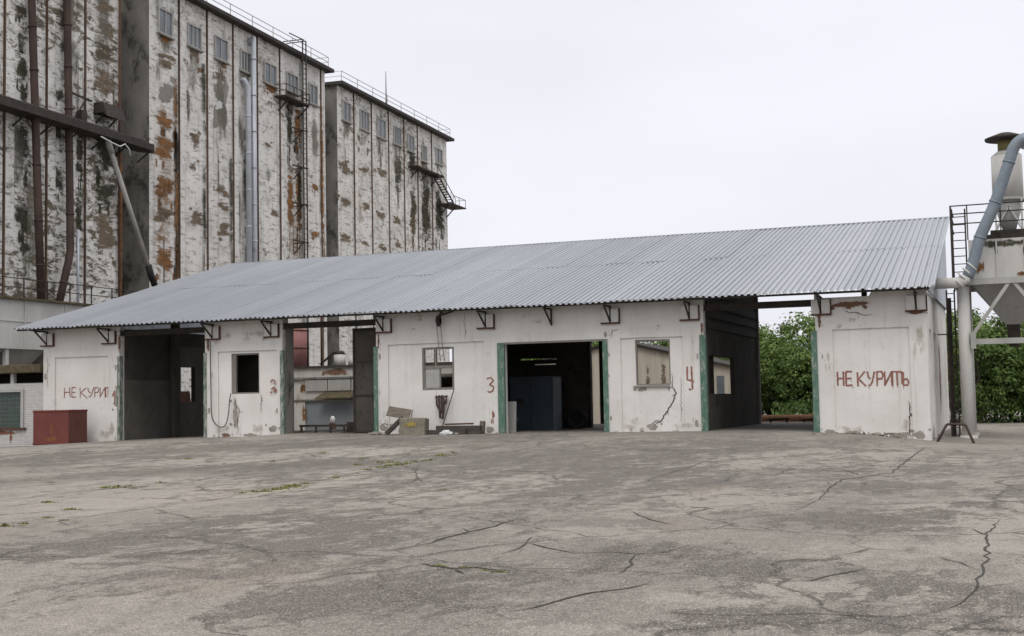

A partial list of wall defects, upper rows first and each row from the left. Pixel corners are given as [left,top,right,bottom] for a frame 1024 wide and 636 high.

water stain [96,0,109,66]
water stain [2,123,35,297]
water stain [75,134,116,248]
rust [154,76,179,280]
water stain [187,49,246,271]
rust [287,94,324,254]
water stain [344,122,444,251]
flaking render [831,301,868,310]
crack [653,376,682,429]